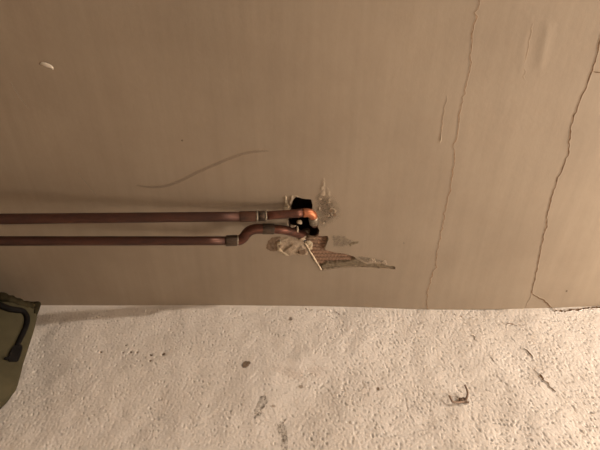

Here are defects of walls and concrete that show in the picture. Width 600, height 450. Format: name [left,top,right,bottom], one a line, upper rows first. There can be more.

spalling [283,177,395,271]
crack [426,0,481,310]
crack [525,36,600,313]